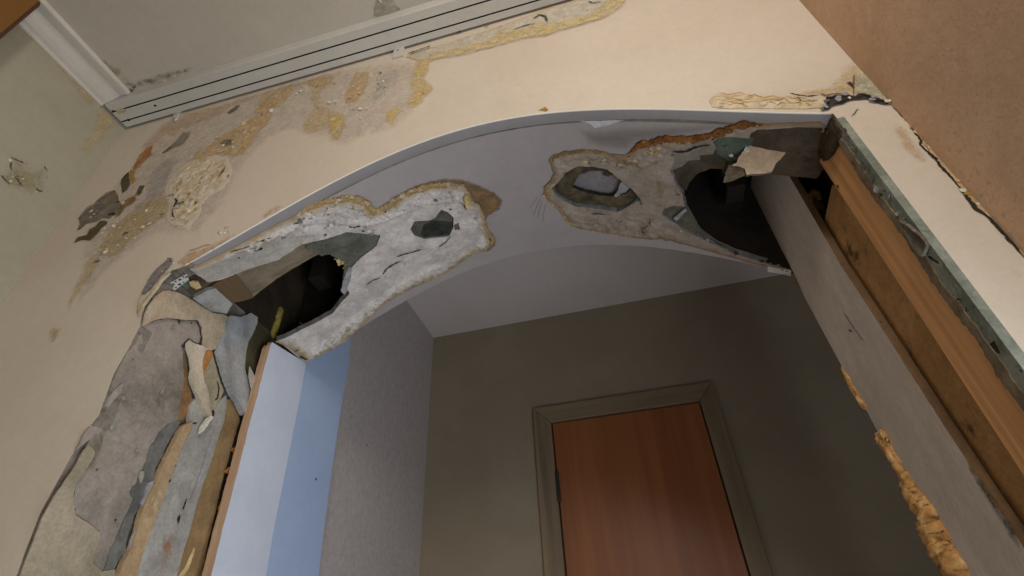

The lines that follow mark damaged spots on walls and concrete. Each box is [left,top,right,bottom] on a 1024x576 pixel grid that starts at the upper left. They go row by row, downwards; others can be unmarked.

flaking render [190,181,495,360]
flaking render [543,120,825,272]
flaking render [855,75,887,100]
crack [821,75,1024,257]
spalling [73,257,258,576]